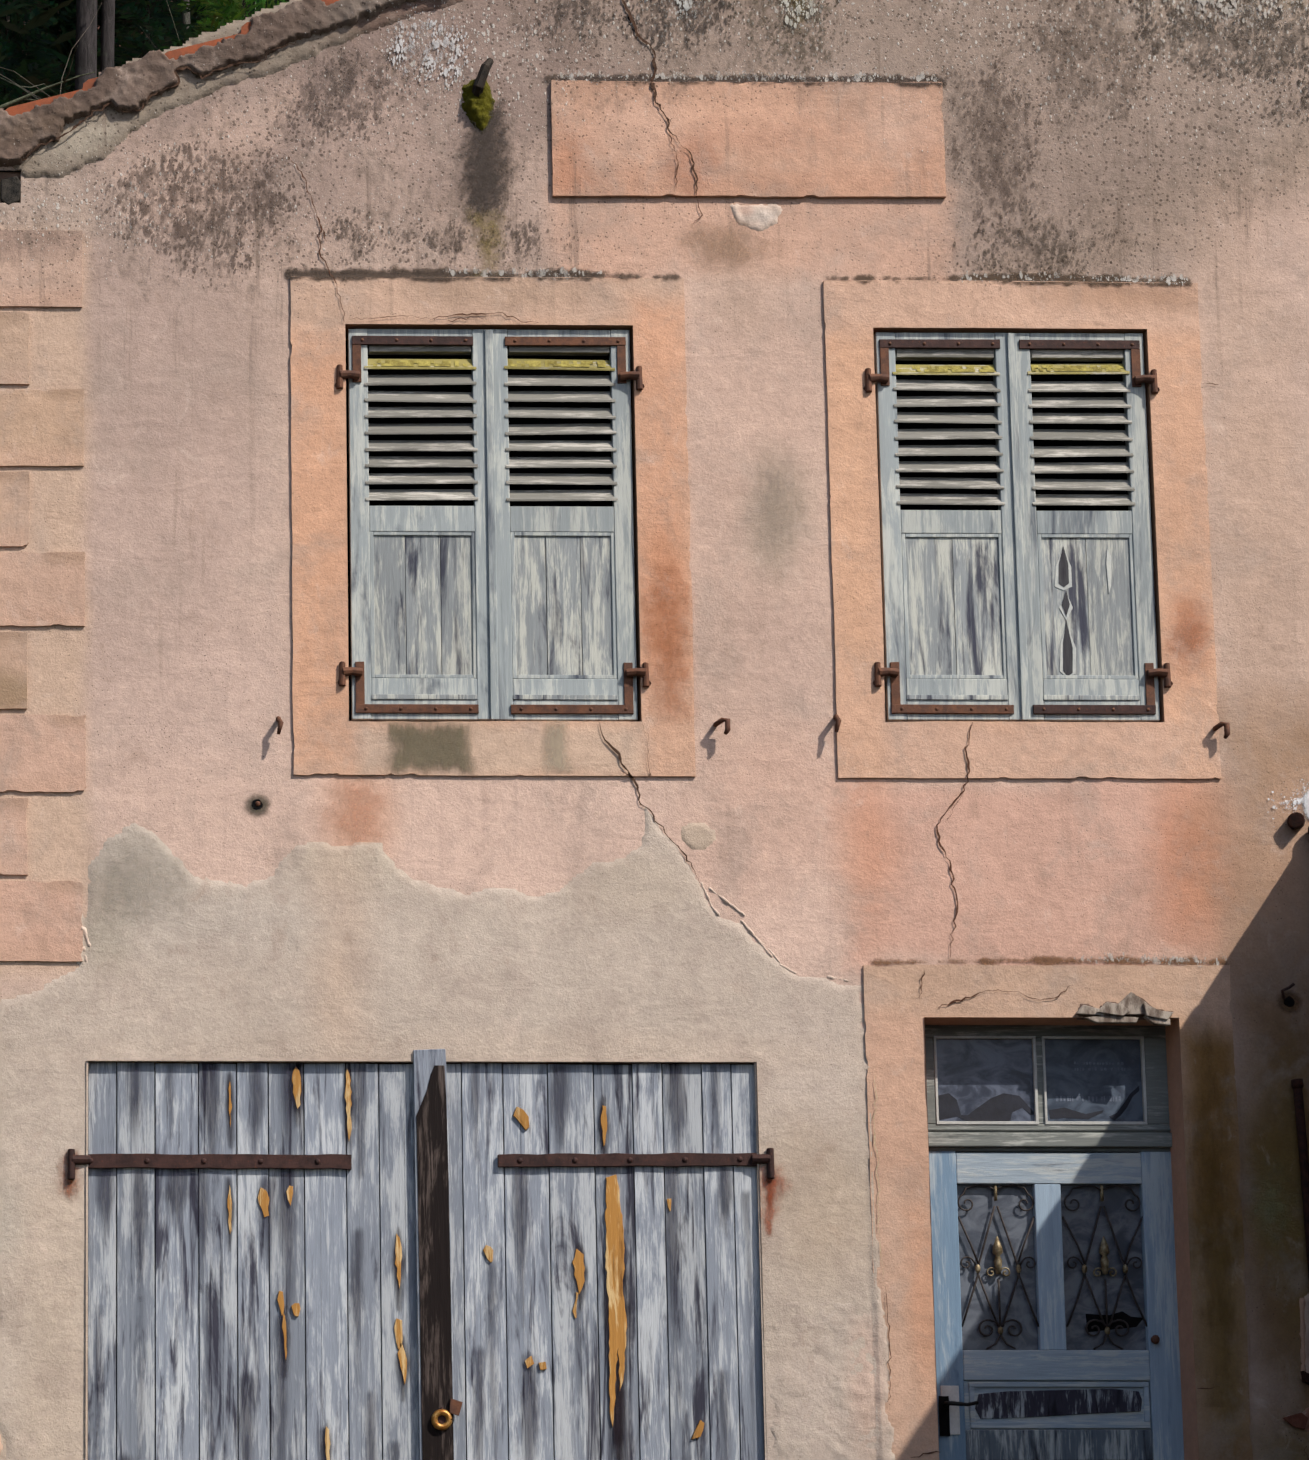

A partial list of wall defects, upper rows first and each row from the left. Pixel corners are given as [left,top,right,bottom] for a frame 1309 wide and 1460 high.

mould [104,135,297,288]
water stain [284,99,681,282]
crack [622,0,703,224]
mould [827,206,1192,287]
mould [1110,0,1309,128]
crack [599,722,700,883]
crack [919,722,1073,1007]
water stain [1267,779,1309,820]
peeling [0,806,895,1460]